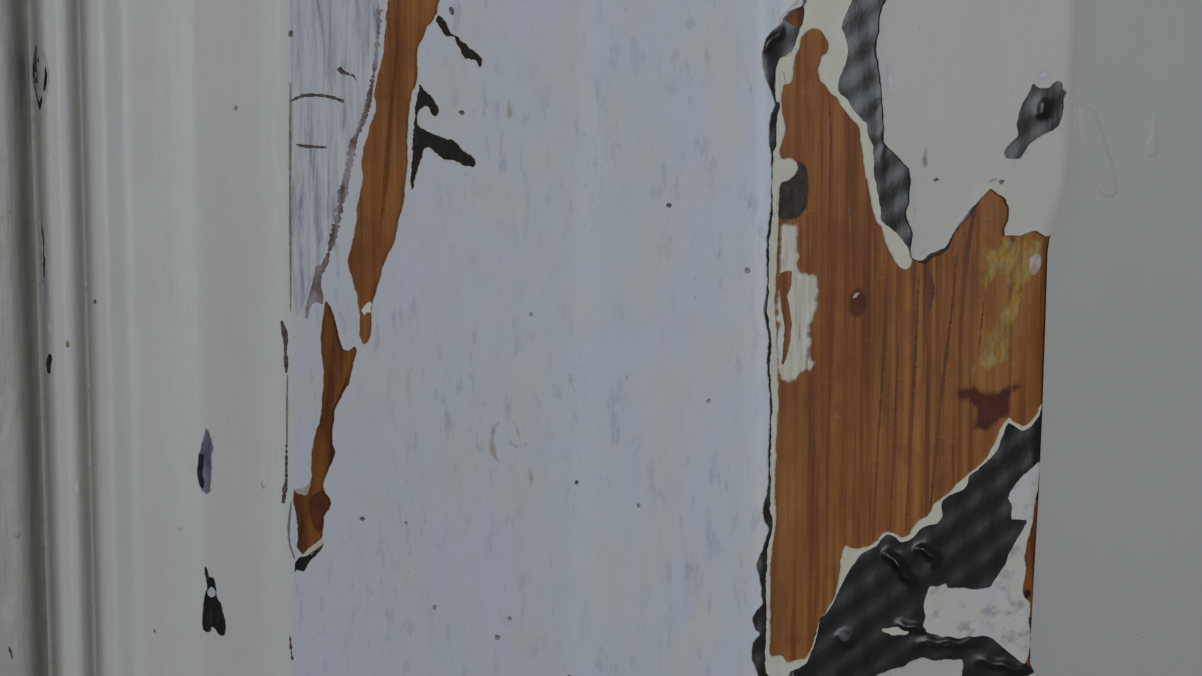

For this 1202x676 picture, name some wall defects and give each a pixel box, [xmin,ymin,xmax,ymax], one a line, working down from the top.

peeling [31,44,50,111]
peeling [1003,80,1068,161]
peeling [290,0,483,572]
peeling [751,0,1051,676]
peeling [196,427,215,496]
peeling [201,565,227,638]